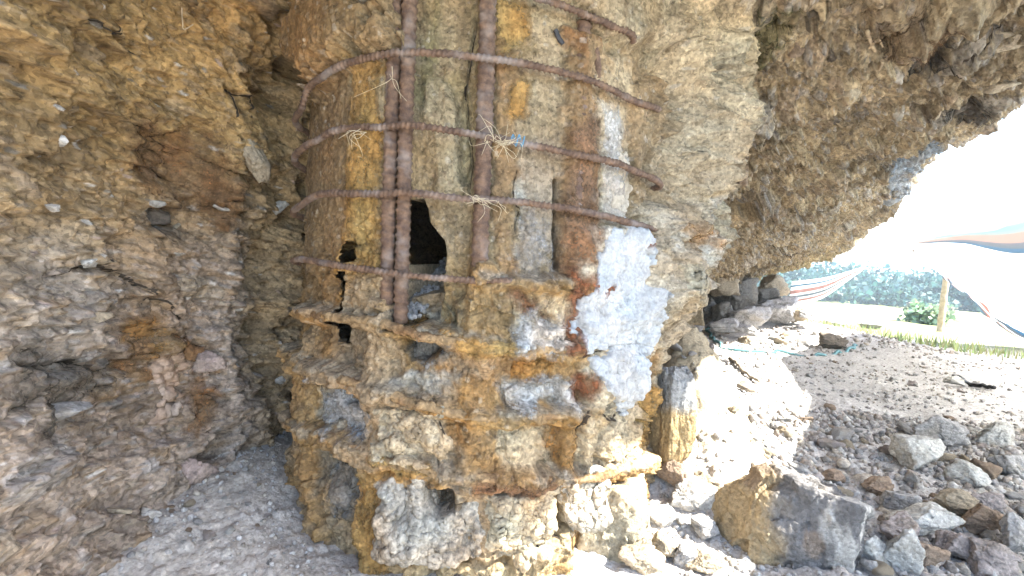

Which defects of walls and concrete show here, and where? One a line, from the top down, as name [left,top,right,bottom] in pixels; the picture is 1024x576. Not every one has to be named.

rust [495,0,530,53]
rust [507,80,530,118]
rust [345,79,384,268]
rust [555,117,615,355]
spalling [508,289,548,322]
peeling [565,151,674,417]
spalling [412,340,447,370]
spalling [323,389,366,436]
spalling [505,374,581,416]
rust [570,374,603,398]
spalling [328,460,360,521]